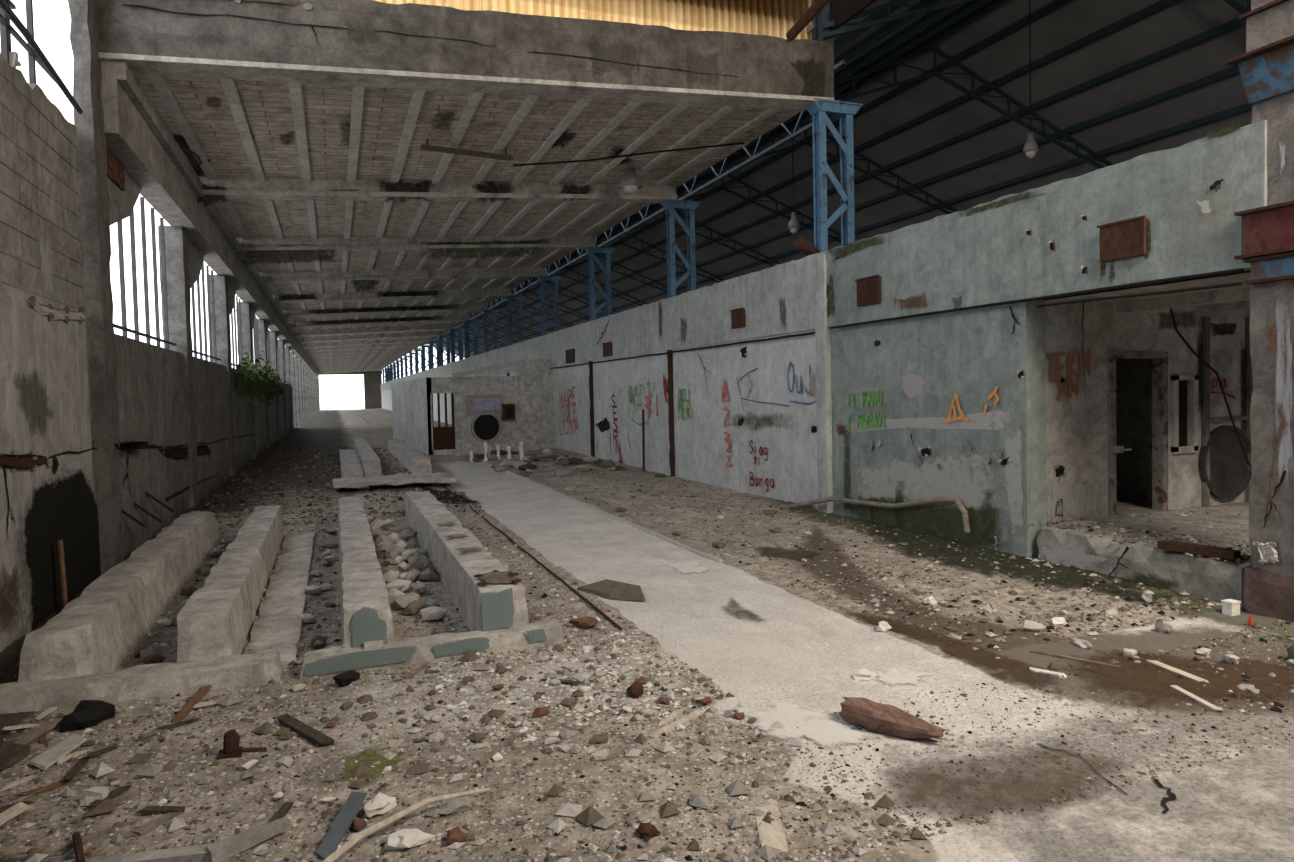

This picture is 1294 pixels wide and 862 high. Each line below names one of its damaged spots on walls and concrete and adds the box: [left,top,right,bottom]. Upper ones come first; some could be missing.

peeling [1276,308,1293,474]
crack [48,448,94,459]
crack [122,434,252,502]
peeling [838,410,1024,536]
crack [1263,470,1286,528]